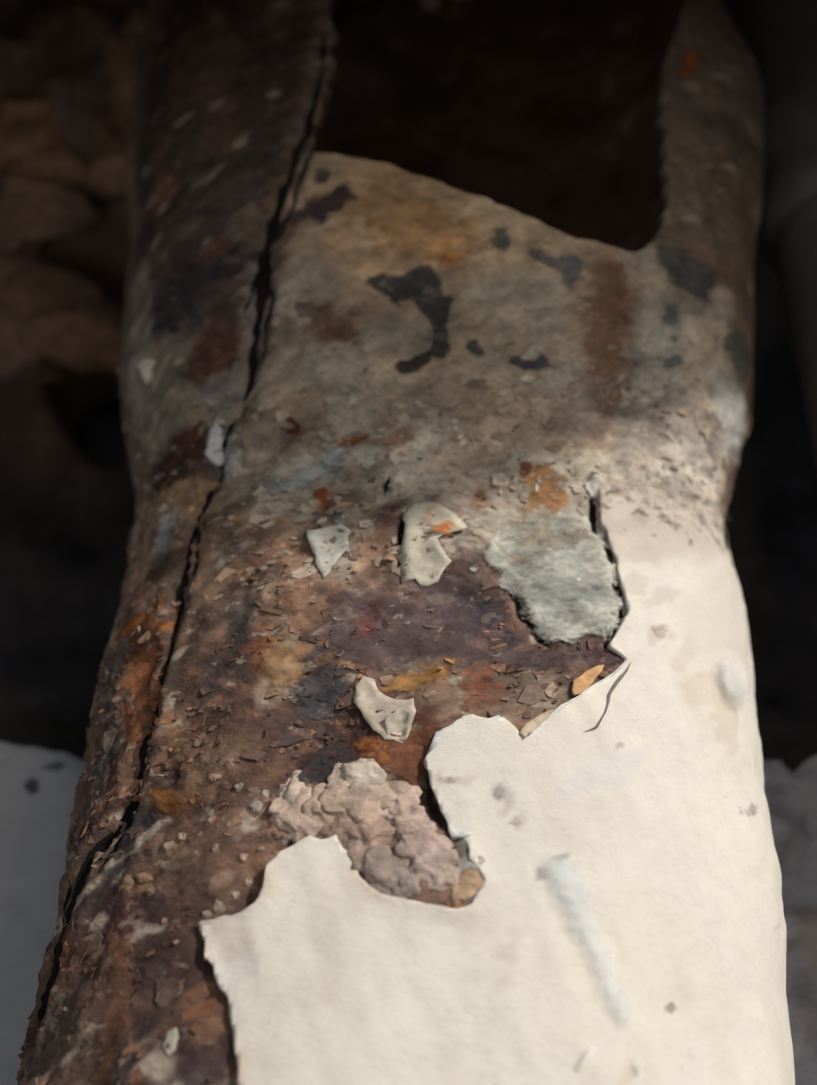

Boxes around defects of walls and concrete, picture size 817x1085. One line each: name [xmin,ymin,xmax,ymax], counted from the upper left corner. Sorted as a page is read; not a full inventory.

damp [366,265,454,374]
damp [529,250,584,289]
damp [655,245,720,304]
crack [34,30,328,1041]
peeling [401,502,624,643]
rust [518,462,569,516]
crack [589,490,623,649]
rust [263,561,625,719]
rust [298,726,439,792]
peeling [354,676,416,744]
crack [584,663,631,732]
spalling [246,758,486,909]